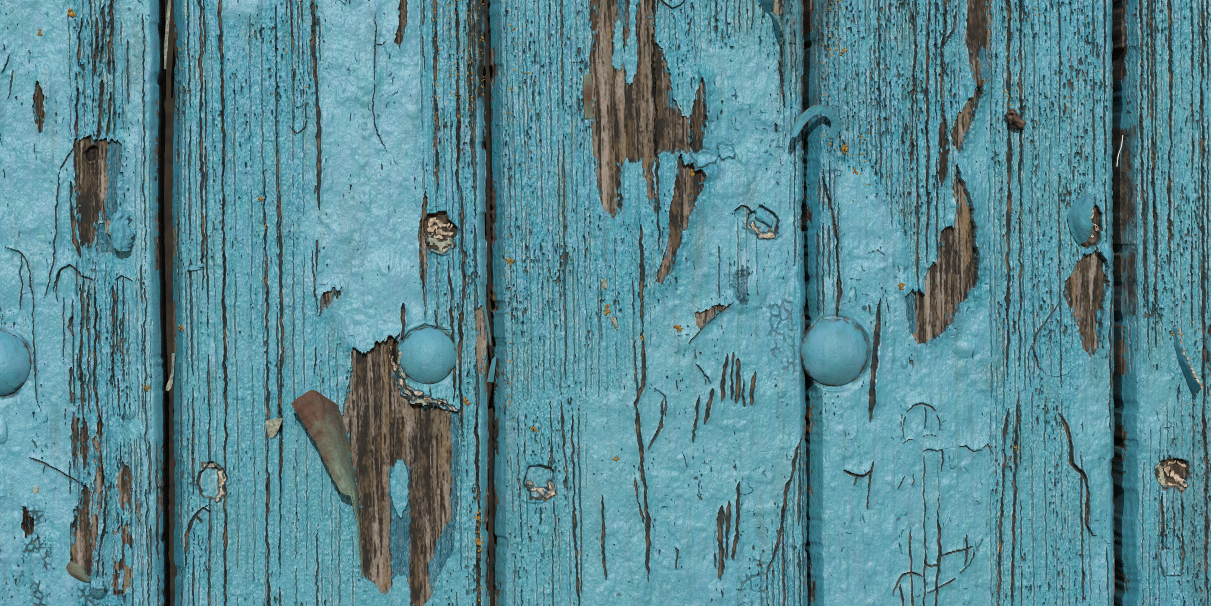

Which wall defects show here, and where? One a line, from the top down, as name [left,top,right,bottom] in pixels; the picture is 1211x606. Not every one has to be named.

peeling [74,136,135,254]
peeling [583,0,734,283]
crack [823,182,888,419]
crack [910,0,957,254]
peeling [905,170,976,345]
peeling [965,0,991,91]
crack [1004,0,1069,377]
peeling [1063,195,1107,355]
peeling [265,336,459,606]
crack [768,441,801,569]
crack [845,402,1019,606]
crack [1059,415,1092,534]